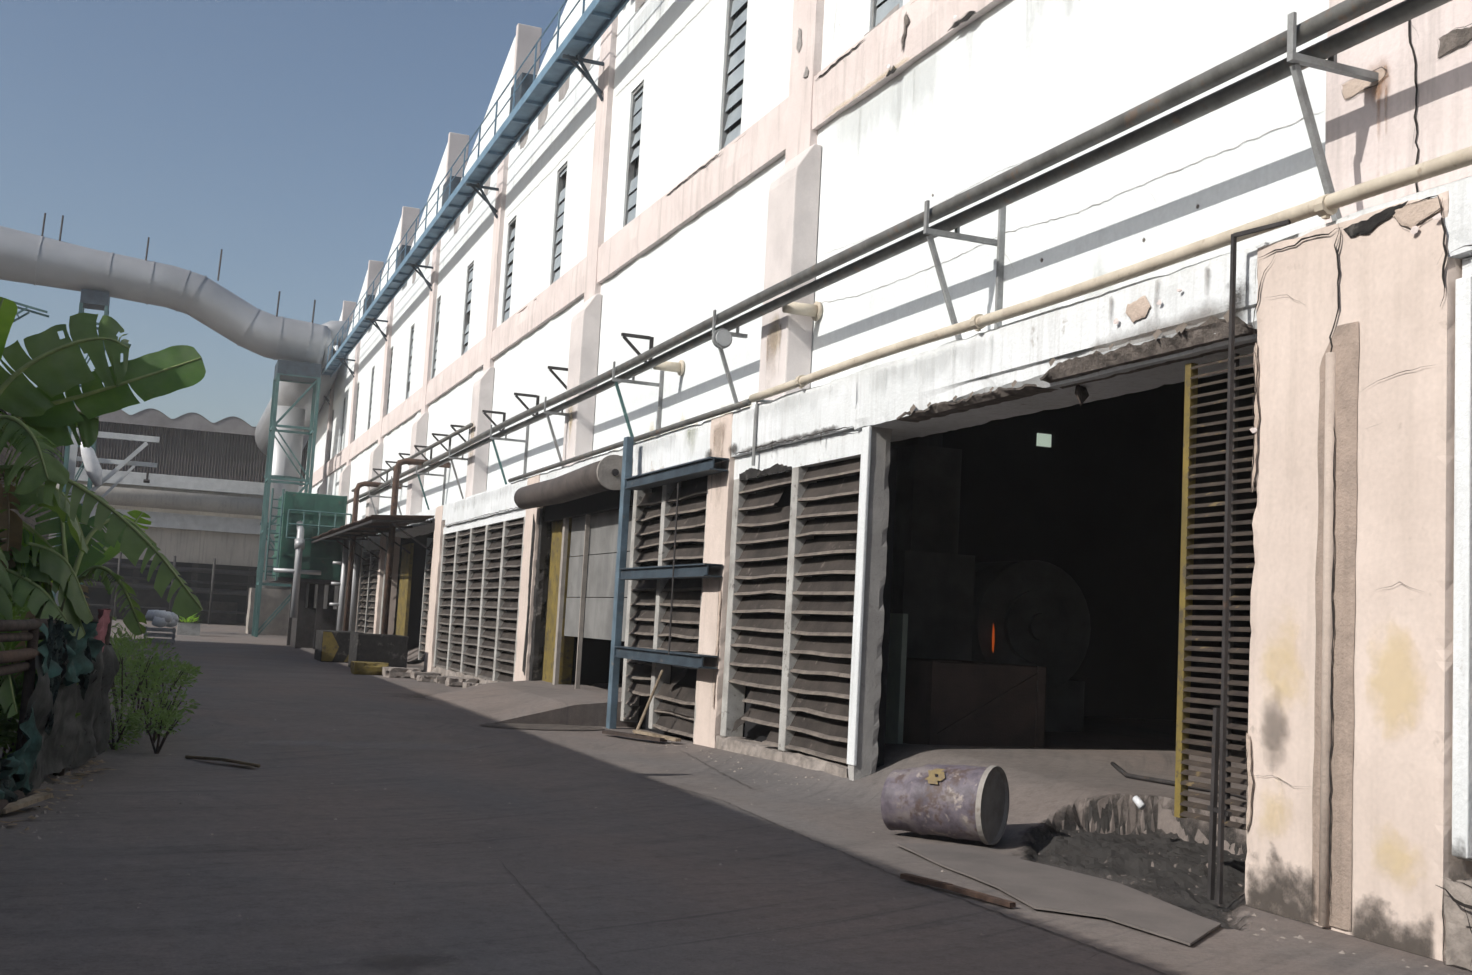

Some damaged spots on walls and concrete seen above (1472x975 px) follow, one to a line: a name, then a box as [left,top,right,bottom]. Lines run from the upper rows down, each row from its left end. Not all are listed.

peeling [796,28,809,78]
spalling [864,4,910,77]
spalling [948,11,976,31]
spalling [1340,65,1388,100]
spalling [1437,23,1472,59]
crack [1408,20,1472,306]
spalling [1343,195,1442,237]
crack [1253,227,1343,352]
spalling [896,296,1260,492]
leakage [1247,853,1315,925]
crack [1436,885,1472,966]